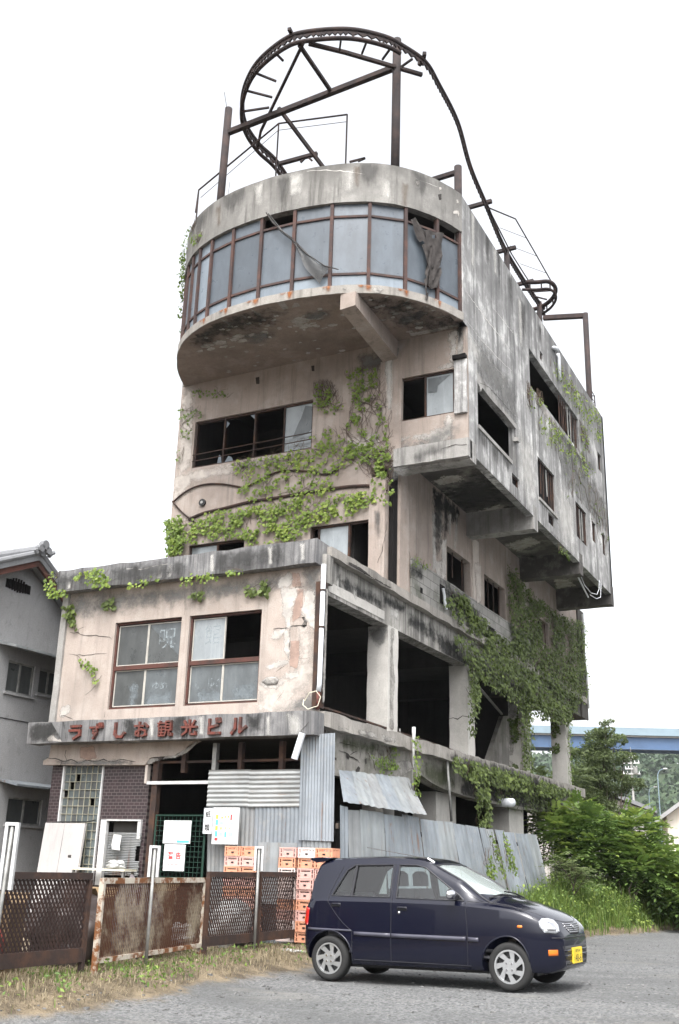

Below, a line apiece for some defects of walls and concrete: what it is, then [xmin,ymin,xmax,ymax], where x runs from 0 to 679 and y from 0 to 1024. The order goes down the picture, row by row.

leakage [226,189,243,209]
leakage [281,176,300,196]
leakage [348,165,376,187]
leakage [472,215,525,340]
leakage [195,312,278,344]
leakage [362,297,462,369]
leakage [479,346,516,423]
leakage [433,469,510,563]
leakage [112,562,184,580]
leakage [212,544,281,571]
flaking render [258,572,328,712]
leakage [337,580,548,706]